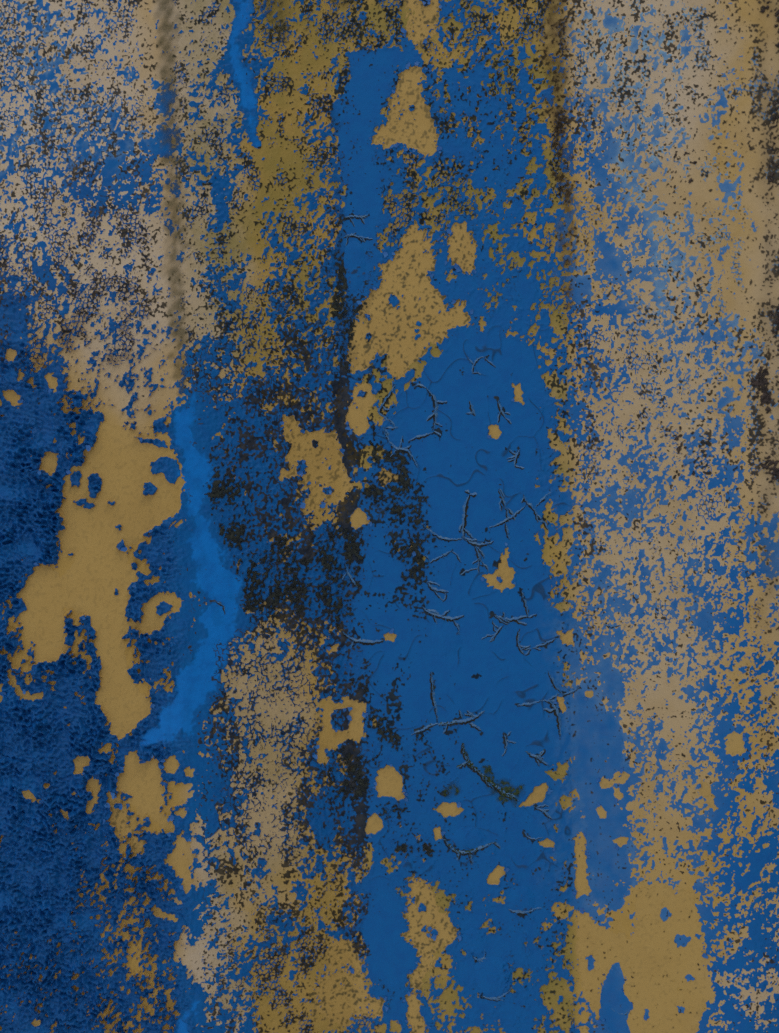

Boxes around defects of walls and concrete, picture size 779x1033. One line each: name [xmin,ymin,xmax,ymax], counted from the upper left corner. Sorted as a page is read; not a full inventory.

peeling [279,219,477,515]
crack [378,384,512,468]
crack [468,356,496,374]
crack [507,449,524,470]
peeling [17,421,185,739]
peeling [312,696,368,764]
crack [342,631,382,648]
crack [411,488,580,841]
peeling [73,750,199,893]
crack [442,836,501,865]
peeling [400,873,462,1033]
peeling [573,832,716,1033]